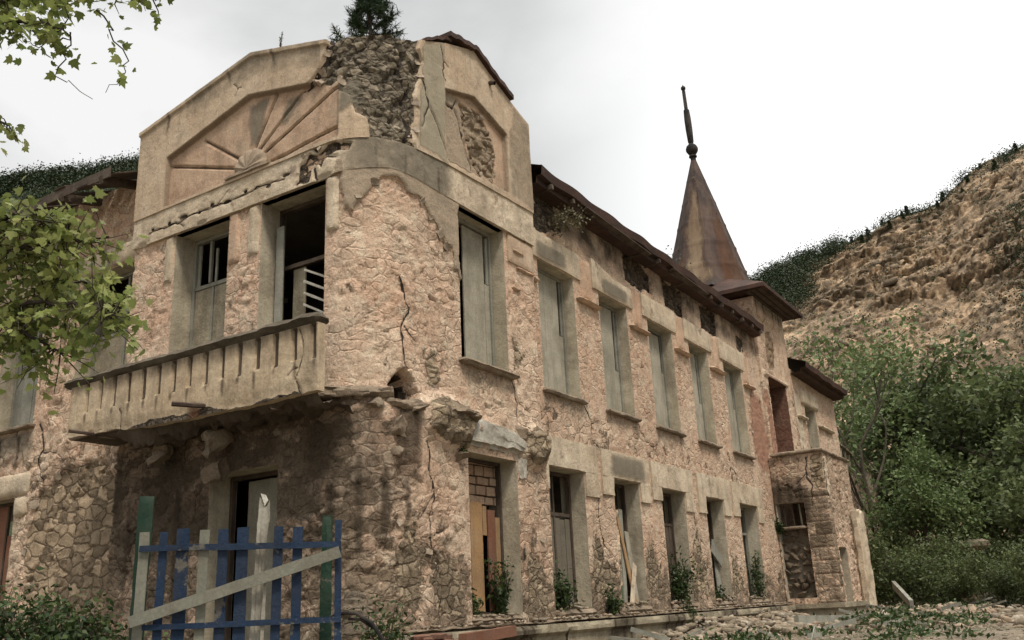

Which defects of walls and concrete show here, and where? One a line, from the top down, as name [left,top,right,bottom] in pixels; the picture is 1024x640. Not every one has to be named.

crack [308,36,471,171]
flaking render [313,34,480,177]
crack [399,276,416,368]
flaking render [108,391,309,431]
crack [420,441,449,619]
crack [797,457,813,500]